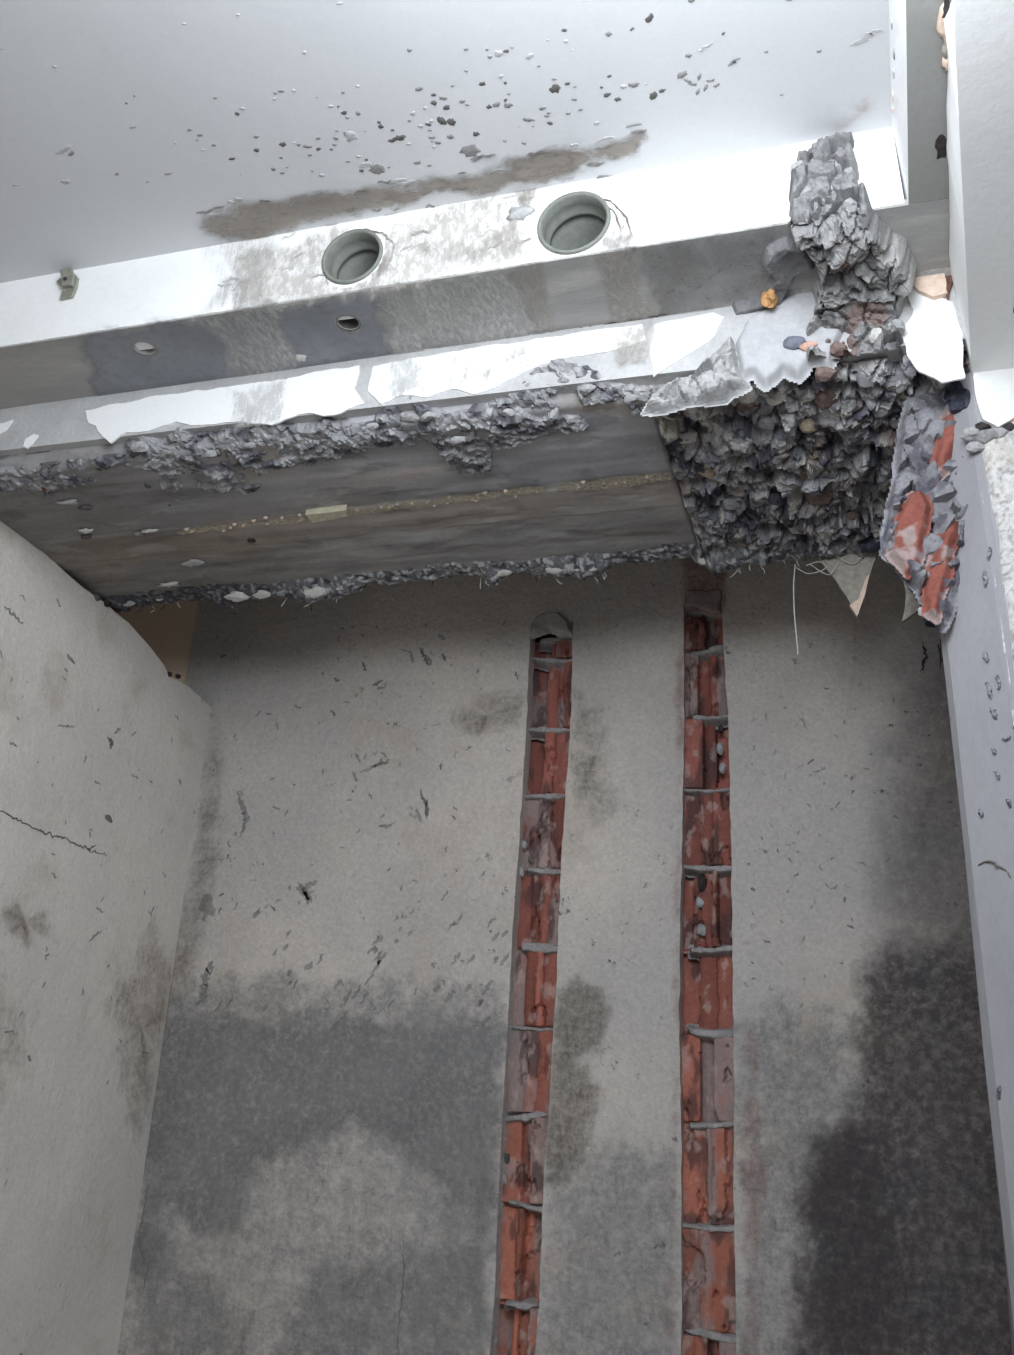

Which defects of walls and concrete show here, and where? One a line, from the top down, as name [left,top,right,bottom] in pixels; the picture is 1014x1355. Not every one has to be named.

leakage [84,123,647,426]
leakage [597,230,776,365]
spalling [0,131,1014,755]
crack [0,810,106,856]
spalling [237,792,250,838]
spalling [295,880,317,905]
spalling [415,789,429,823]
spalling [197,960,234,1012]
spalling [322,915,413,1033]
leakage [126,976,509,1355]
leakage [546,985,604,1181]
leakage [742,946,1012,1355]